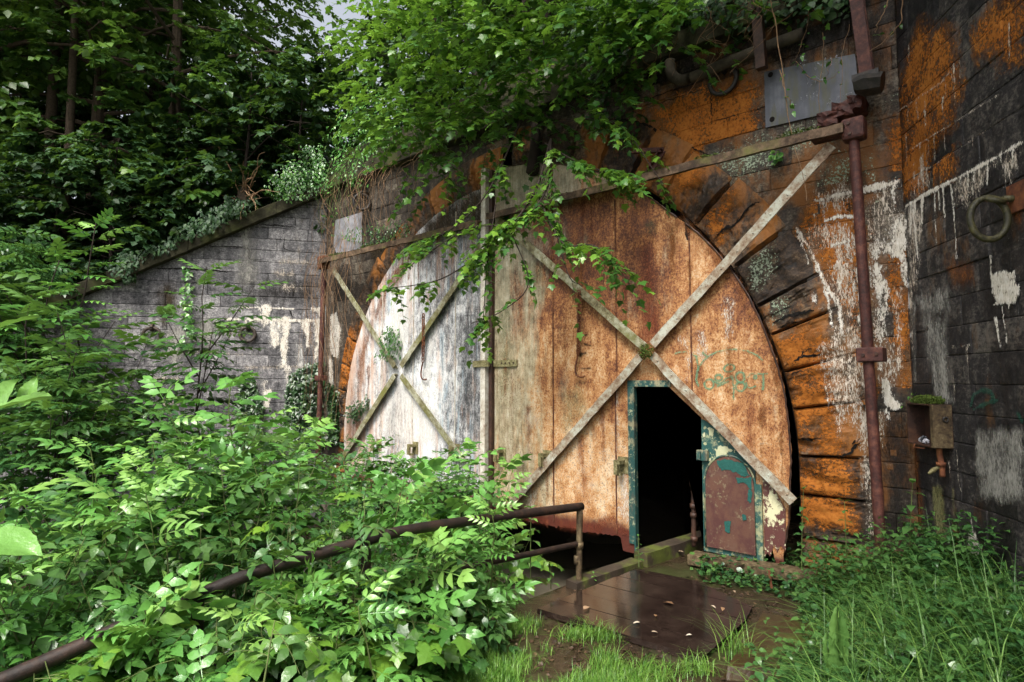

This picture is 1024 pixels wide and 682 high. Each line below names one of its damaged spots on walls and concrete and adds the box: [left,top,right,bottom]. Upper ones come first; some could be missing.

water stain [767,5,855,64]
water stain [153,282,341,408]
corrosion [347,254,419,442]
corrosion [669,223,766,345]
water stain [796,63,1023,544]
peeling [703,427,752,533]